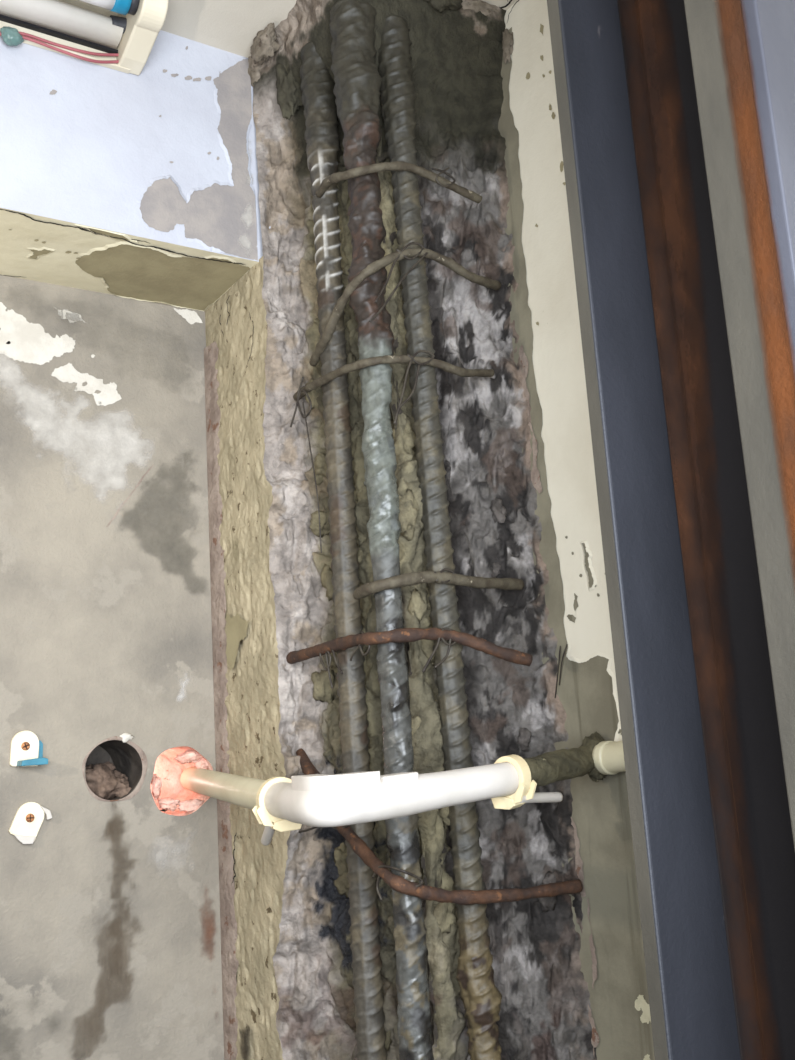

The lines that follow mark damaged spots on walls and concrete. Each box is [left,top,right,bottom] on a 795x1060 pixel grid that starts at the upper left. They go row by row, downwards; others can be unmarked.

peeling [0,302,122,406]
spalling [26,0,343,779]
spalling [337,116,384,775]
spalling [356,0,622,774]
damp [84,922,130,1038]
spalling [272,824,358,1060]
spalling [373,820,400,1060]
spalling [417,807,471,1060]
spalling [476,772,655,1060]